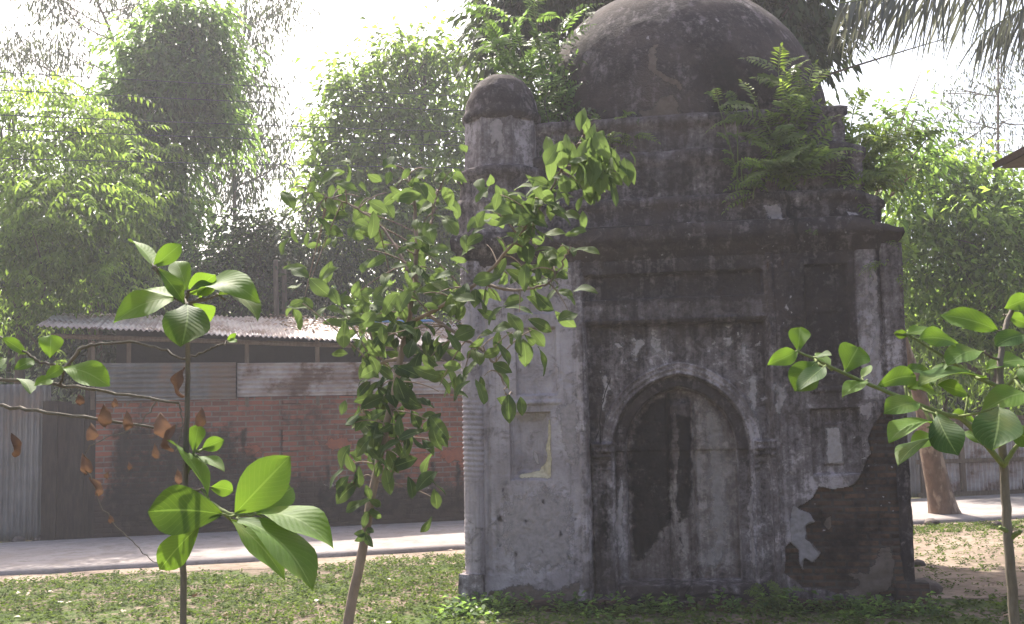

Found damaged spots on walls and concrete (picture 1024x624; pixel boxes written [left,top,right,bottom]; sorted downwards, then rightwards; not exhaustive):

damp [628,393,693,561]
spalling [784,260,904,597]